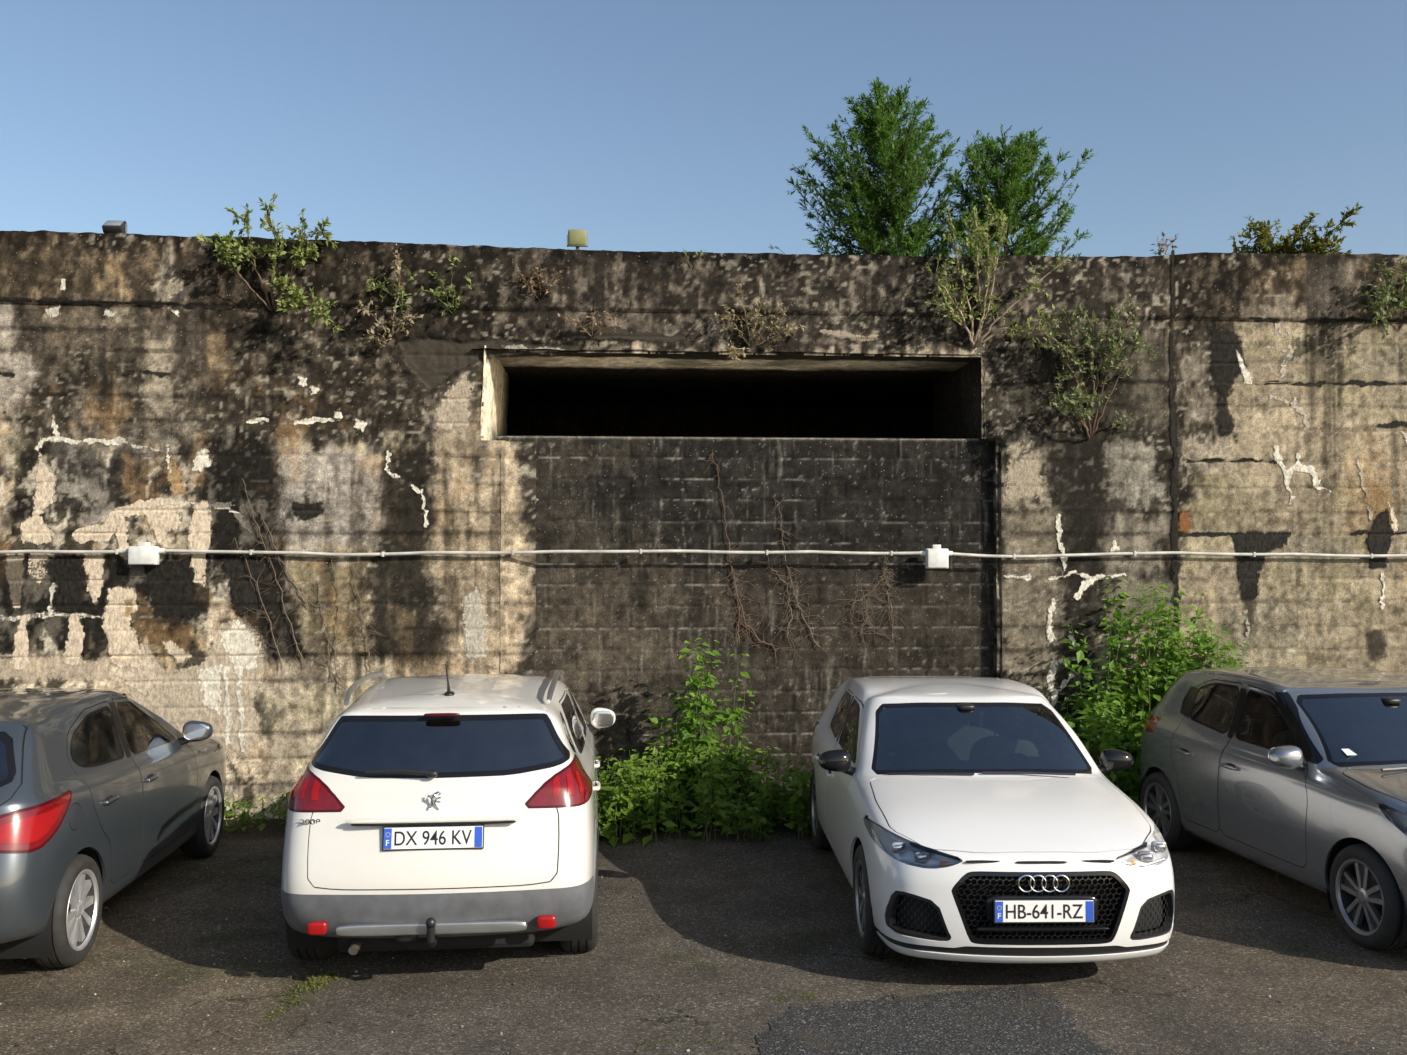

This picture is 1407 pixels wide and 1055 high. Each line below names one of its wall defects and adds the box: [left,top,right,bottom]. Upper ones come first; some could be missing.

water stain [45,279,66,318]
water stain [297,376,320,395]
water stain [1209,328,1253,437]
water stain [334,412,367,432]
water stain [1273,445,1331,508]
water stain [293,501,324,520]
water stain [0,444,268,671]
water stain [1231,530,1291,637]
water stain [1366,508,1393,609]
water stain [463,587,489,658]
water stain [1046,598,1076,647]
water stain [1366,628,1387,661]